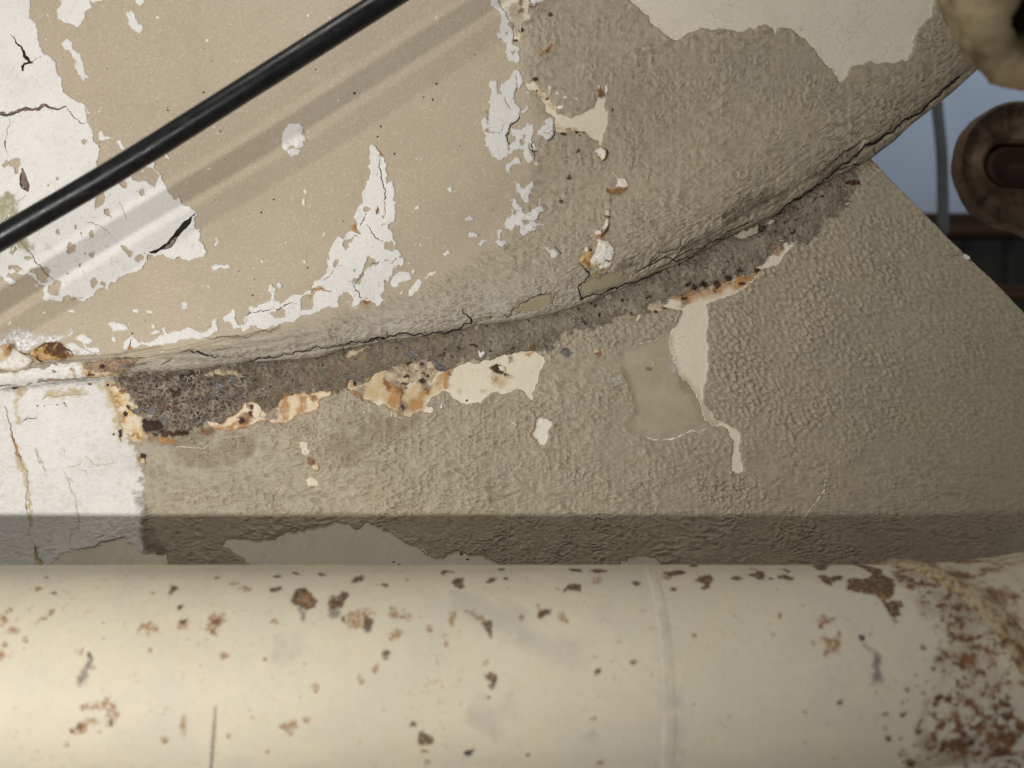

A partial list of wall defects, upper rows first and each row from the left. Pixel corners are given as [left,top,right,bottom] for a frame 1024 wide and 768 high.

crack [11,35,41,75]
crack [0,103,87,157]
peeling [0,0,125,223]
peeling [629,0,935,83]
crack [12,239,53,279]
peeling [0,154,231,314]
peeling [108,125,437,350]
rust [17,168,860,464]
peeling [348,351,545,419]
crack [115,74,960,367]
peeling [636,240,797,474]
crack [6,409,179,565]